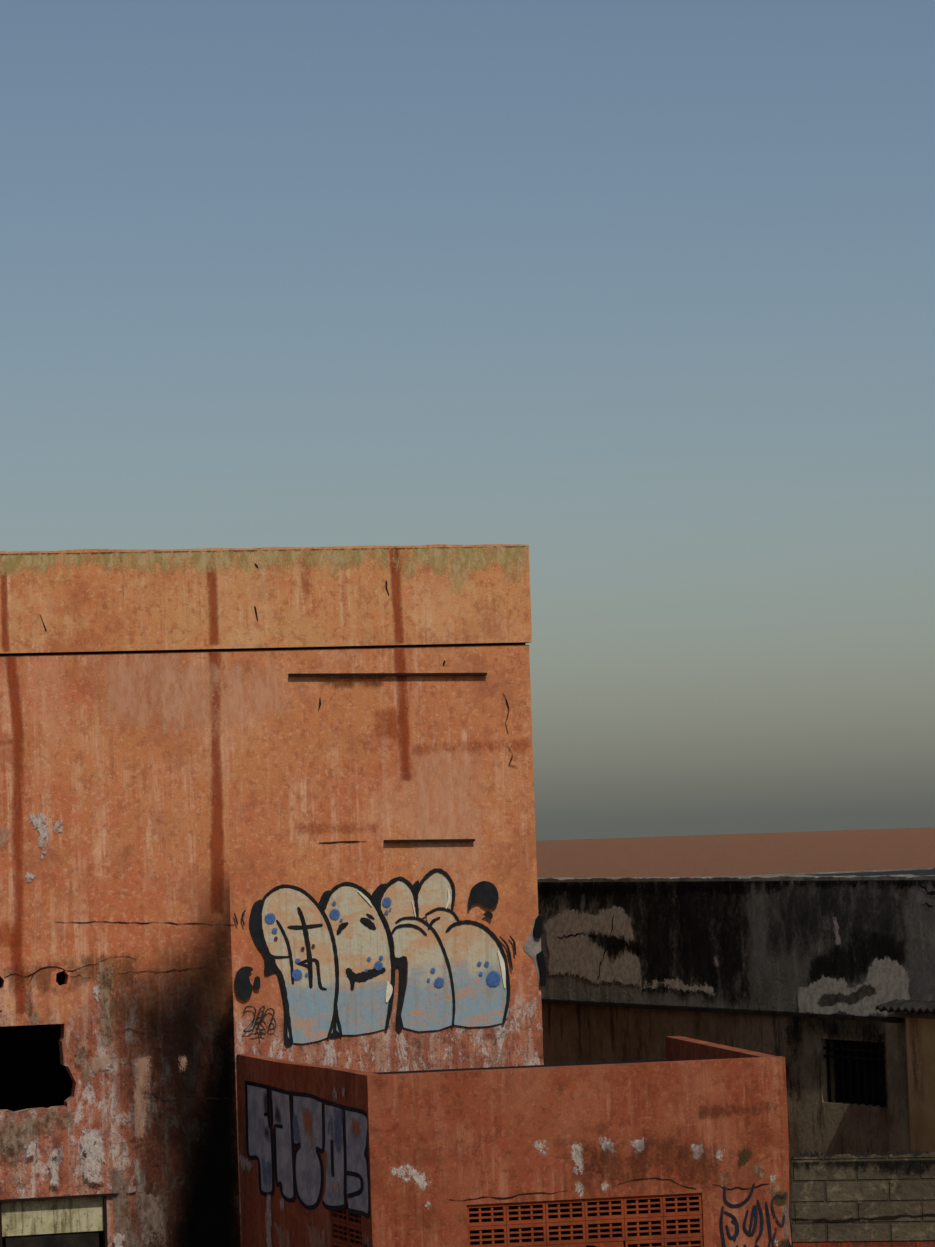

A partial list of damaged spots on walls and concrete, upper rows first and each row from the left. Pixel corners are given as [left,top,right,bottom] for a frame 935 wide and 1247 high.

crack [4,956,207,983]
crack [55,919,231,927]
peeling [523,905,715,996]
damp [537,880,935,1005]
peeling [798,956,910,1019]
damp [134,1058,150,1137]
peeling [0,1109,165,1247]
peeling [391,1164,432,1209]
peeling [571,1143,584,1196]
peeling [599,1136,616,1153]
peeling [631,1138,646,1154]
peeling [691,1144,728,1186]